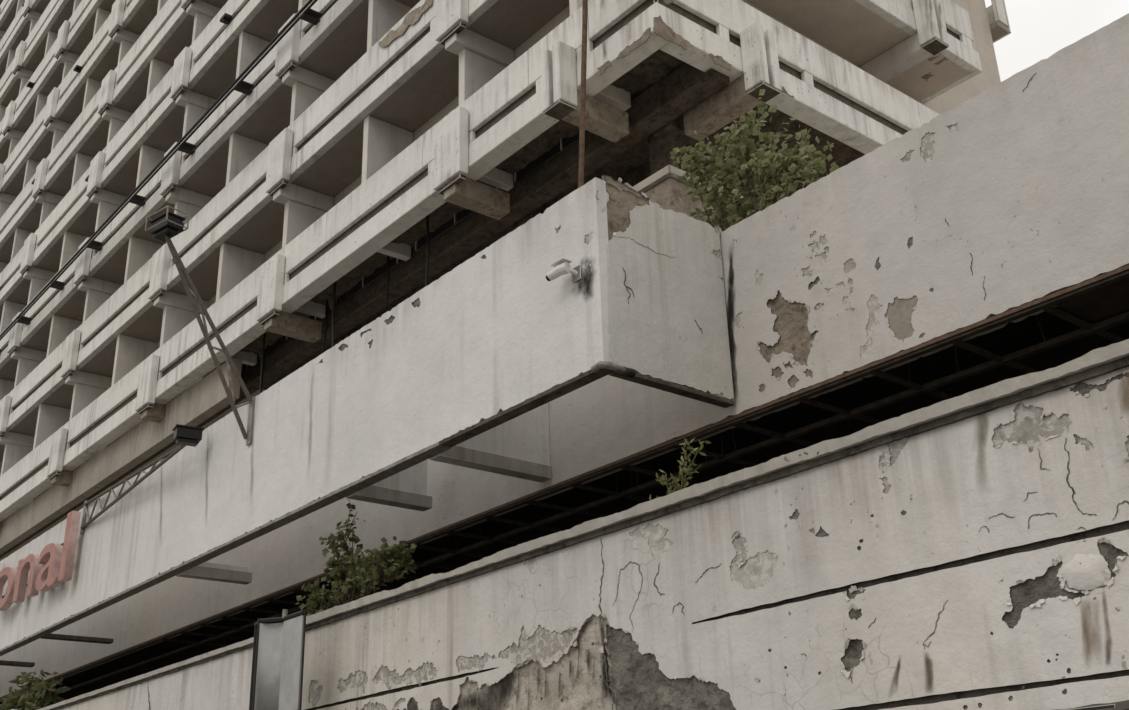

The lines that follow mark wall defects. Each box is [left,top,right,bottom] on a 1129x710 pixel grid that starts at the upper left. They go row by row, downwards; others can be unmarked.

flaking render [595,175,650,241]
crack [623,268,635,304]
flaking render [757,231,934,392]
peeling [991,401,1094,453]
crack [978,438,1129,533]
flaking render [308,613,736,710]
crack [599,542,721,710]
flaking render [840,638,866,678]
flaking render [1002,555,1090,629]
flaking render [1097,537,1129,588]